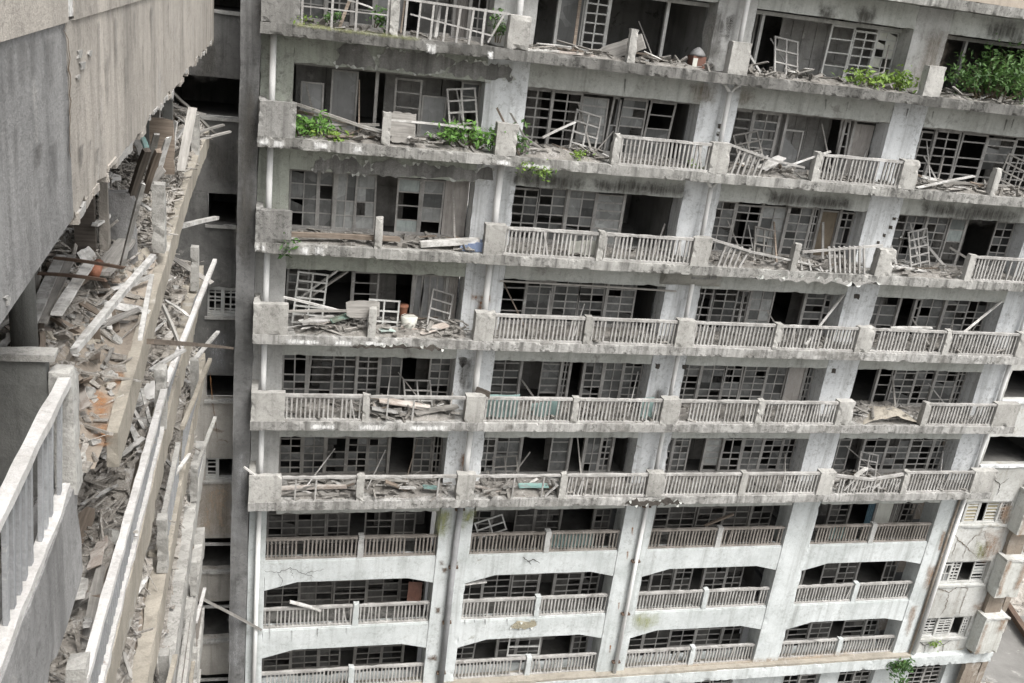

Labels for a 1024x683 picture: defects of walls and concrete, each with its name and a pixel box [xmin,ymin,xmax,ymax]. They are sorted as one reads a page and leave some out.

spalling [625,497,684,508]
peeling [510,620,538,630]